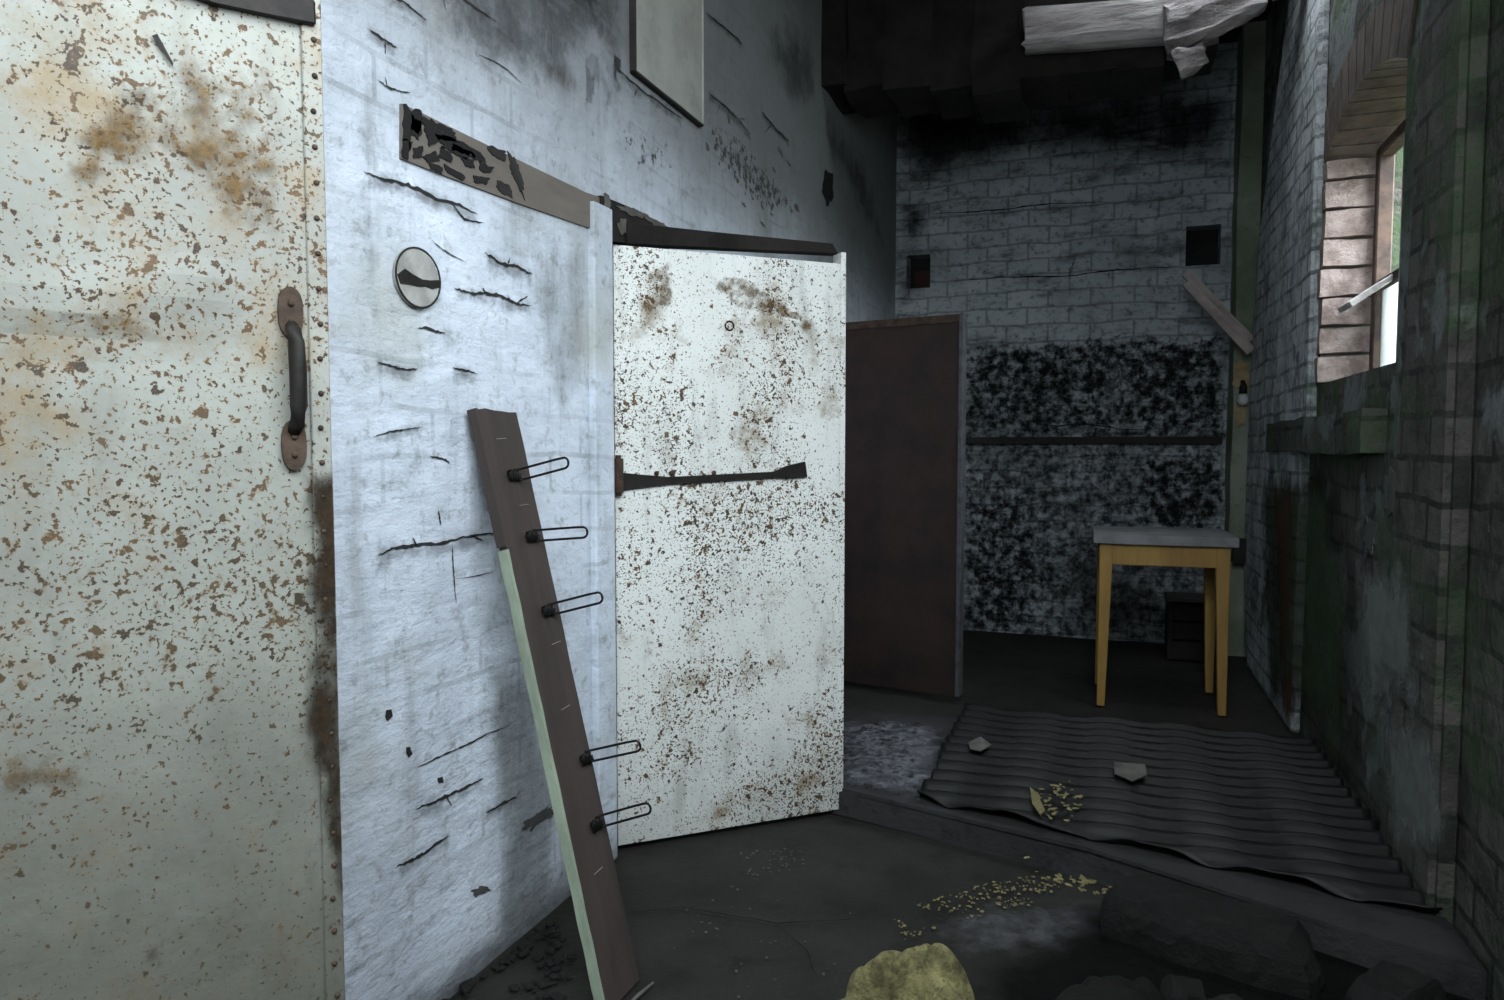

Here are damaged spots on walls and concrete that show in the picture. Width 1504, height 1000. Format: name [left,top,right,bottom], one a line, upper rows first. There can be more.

corrosion [75,109,144,177]
corrosion [168,131,275,211]
crack [364,171,533,306]
corrosion [644,269,672,309]
corrosion [717,279,811,329]
crack [378,362,417,371]
crack [419,326,476,374]
crack [375,427,449,463]
crack [379,511,493,597]
crack [397,724,517,867]